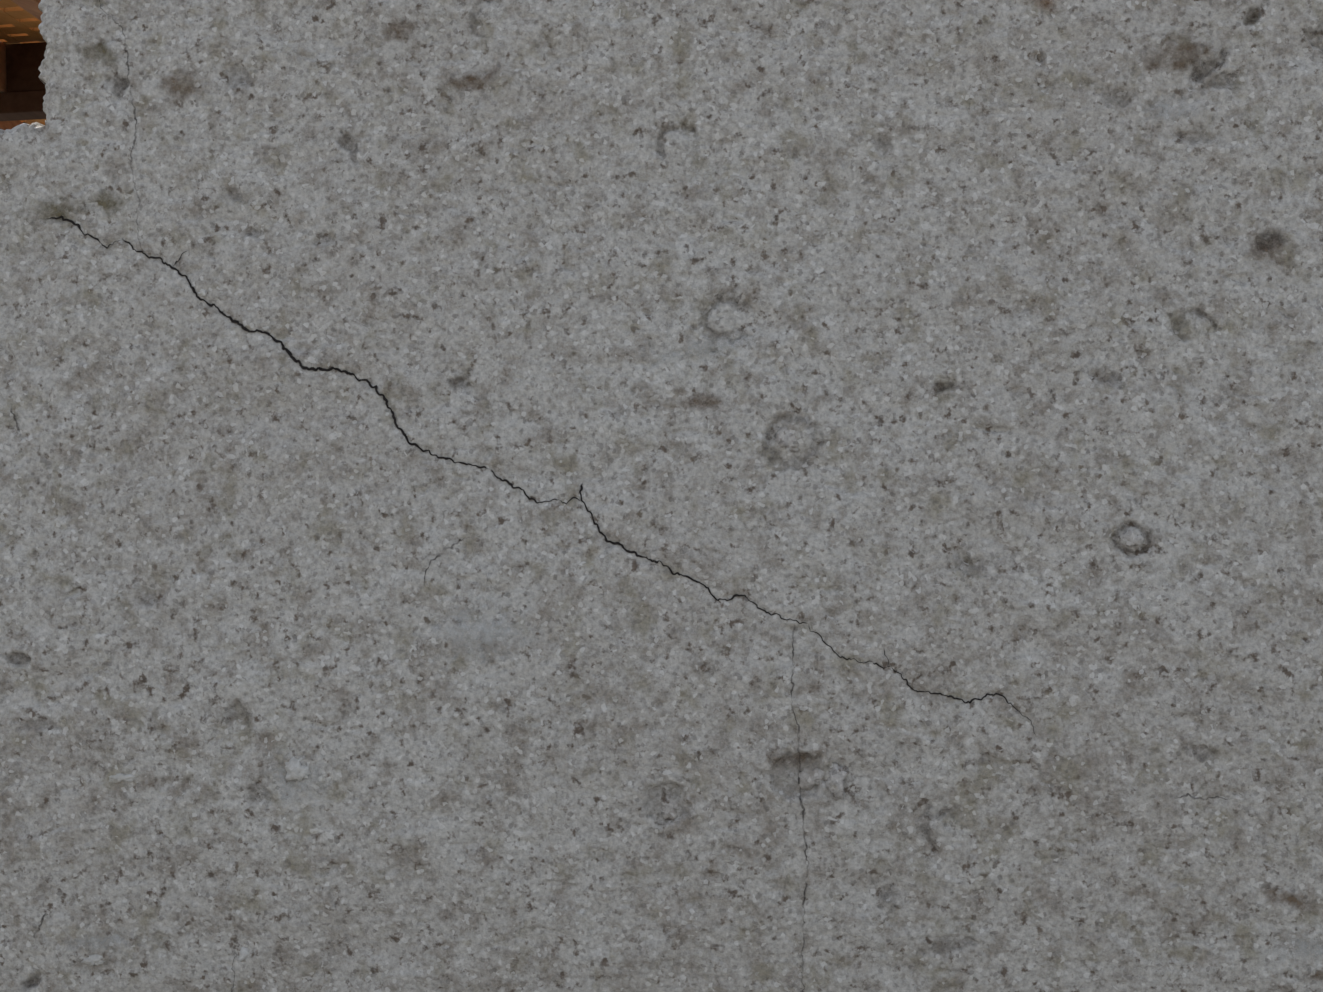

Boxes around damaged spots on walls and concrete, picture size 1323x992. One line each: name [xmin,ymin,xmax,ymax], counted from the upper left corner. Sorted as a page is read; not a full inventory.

crack [49,215,1036,905]